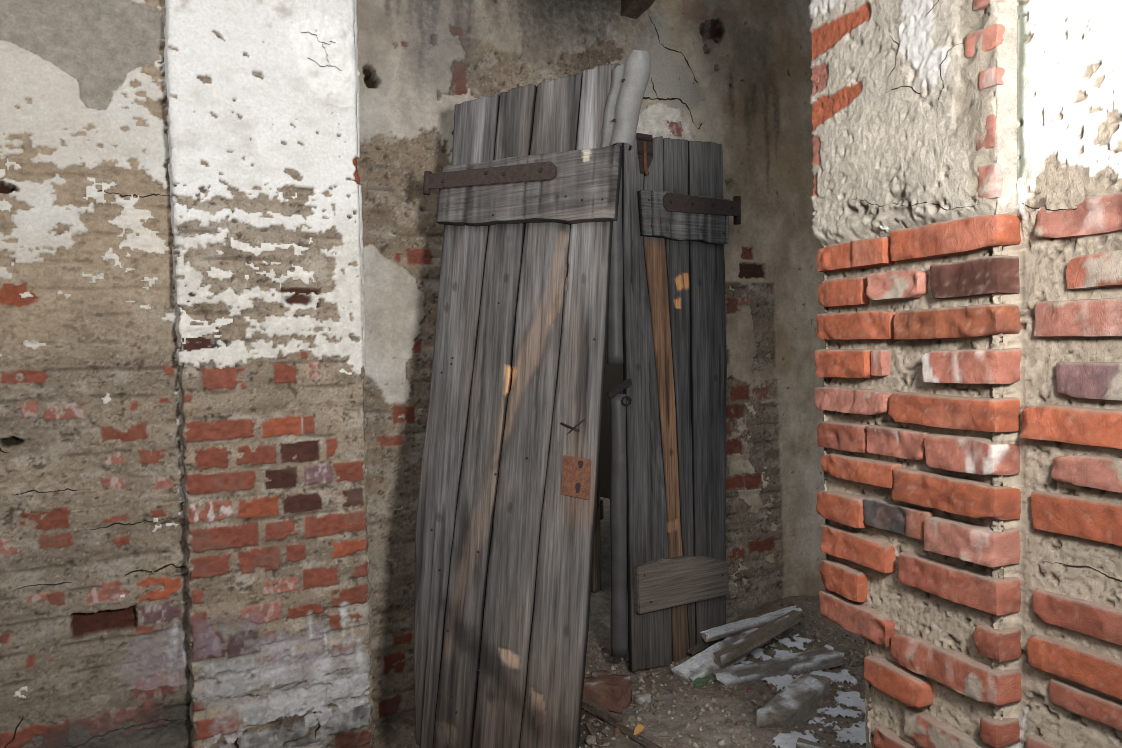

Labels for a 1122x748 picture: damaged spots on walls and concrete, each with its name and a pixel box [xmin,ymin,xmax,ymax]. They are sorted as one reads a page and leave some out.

flaking render [0,0,165,110]
flaking render [134,100,169,126]
spalling [363,64,382,90]
flaking render [449,27,622,98]
crack [643,16,702,129]
crack [886,35,962,107]
flaking render [809,0,1122,247]
flaking render [0,129,450,748]
crack [1043,561,1122,582]